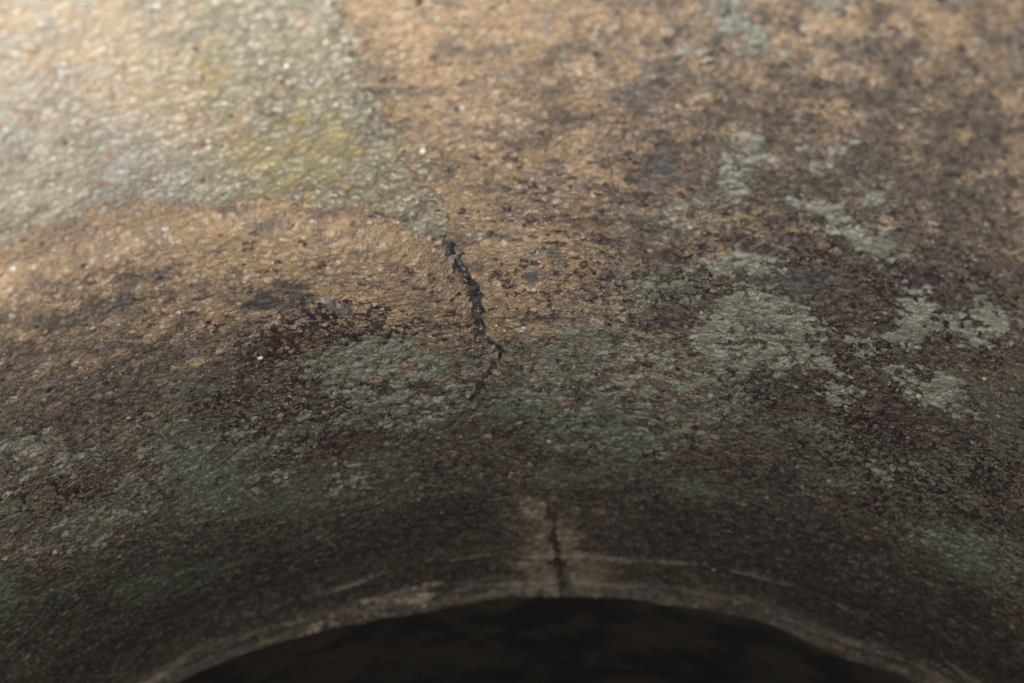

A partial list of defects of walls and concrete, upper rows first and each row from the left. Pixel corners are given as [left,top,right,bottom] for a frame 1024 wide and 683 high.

crack [433,231,504,402]
crack [541,498,567,592]